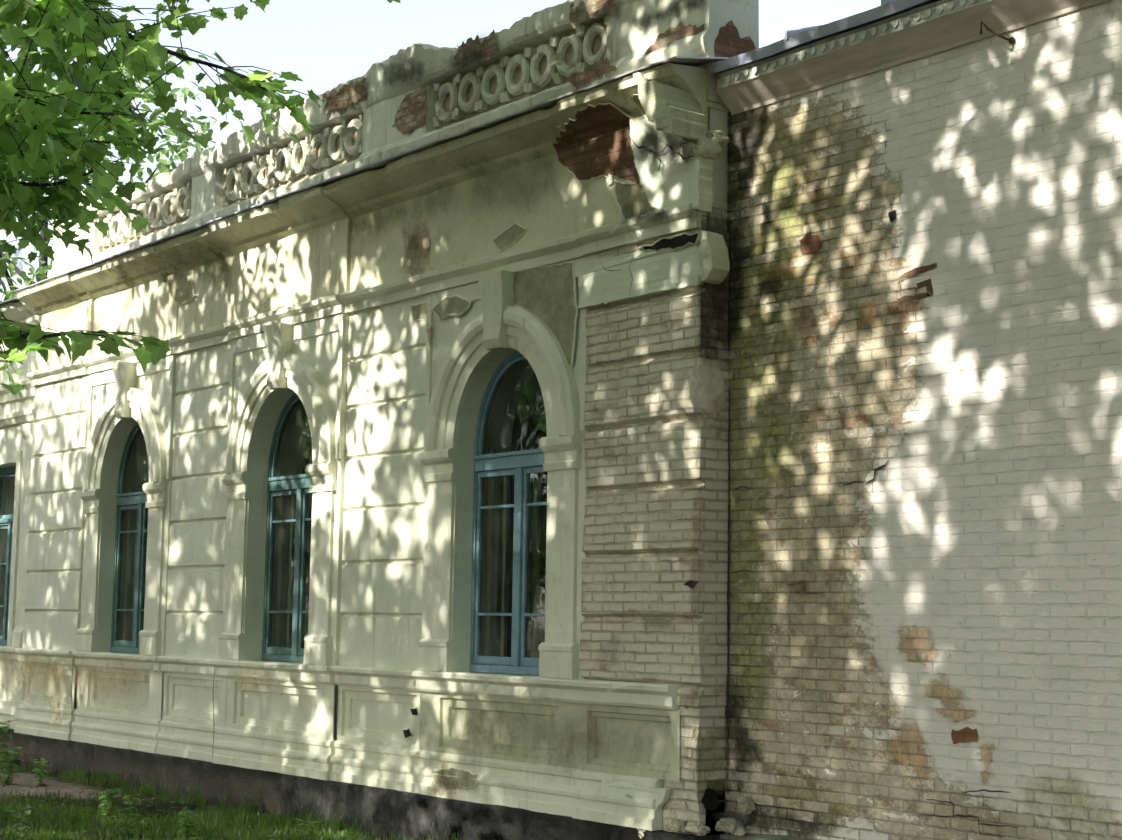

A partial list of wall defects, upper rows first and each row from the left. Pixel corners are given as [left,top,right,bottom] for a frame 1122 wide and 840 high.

spalling [569,0,616,29]
spalling [454,29,499,69]
spalling [641,22,705,56]
spalling [714,20,756,58]
spalling [323,78,366,114]
crack [631,139,694,171]
leakage [697,105,800,361]
leakage [772,311,796,478]
peeling [513,90,1020,840]
crack [844,460,889,486]
leakage [698,592,840,837]
crack [921,789,1019,837]